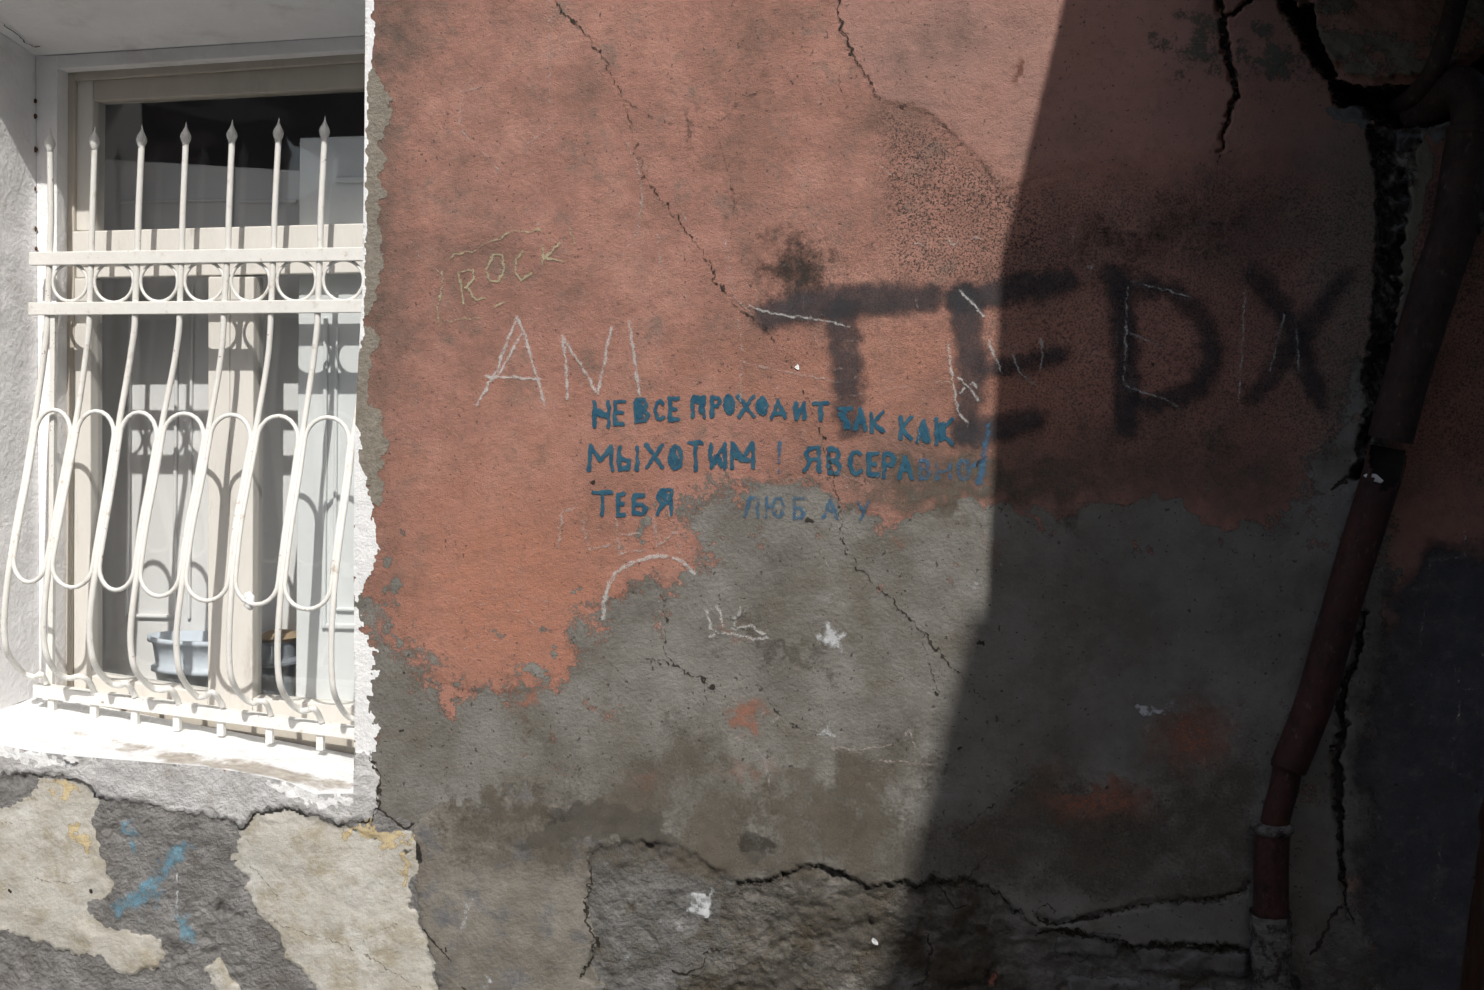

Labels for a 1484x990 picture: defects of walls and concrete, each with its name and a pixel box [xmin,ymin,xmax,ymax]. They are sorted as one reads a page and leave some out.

crack [555,0,985,699]
crack [1212,0,1338,199]
crack [1330,123,1423,490]
peeling [1388,121,1450,336]
peeling [0,353,1386,990]
peeling [1289,516,1484,990]